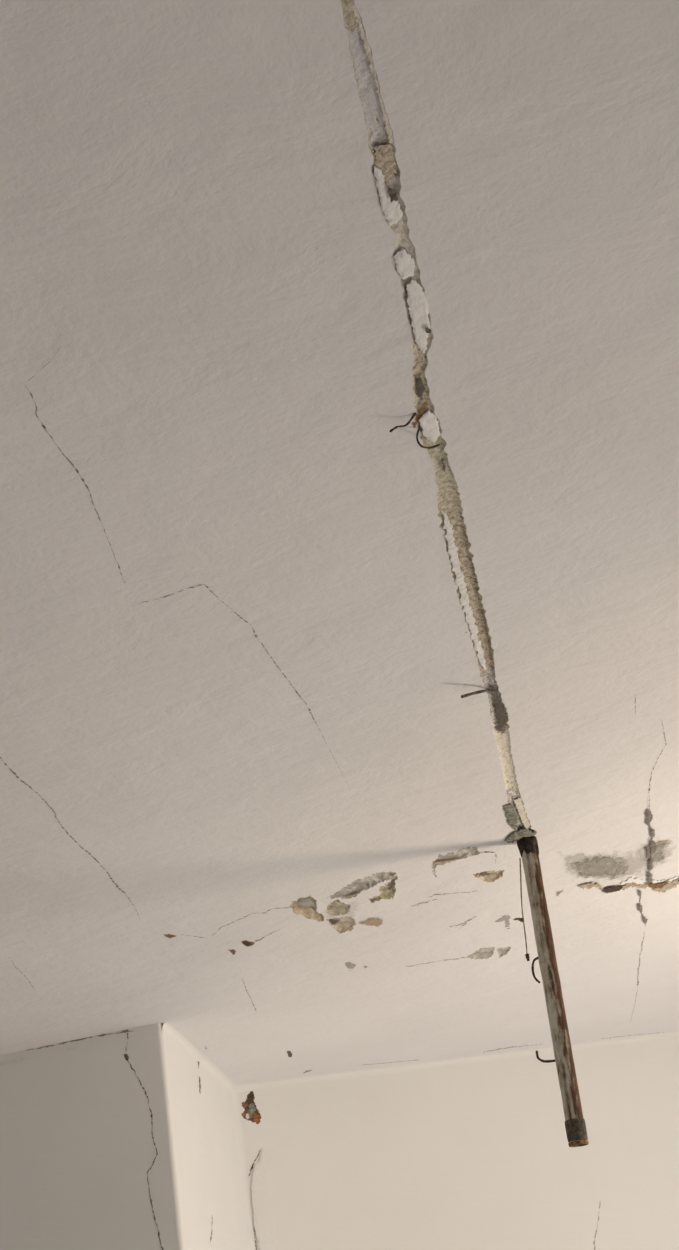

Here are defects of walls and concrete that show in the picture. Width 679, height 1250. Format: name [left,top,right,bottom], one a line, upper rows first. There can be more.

flaking render [374,166,403,227]
flaking render [394,249,431,353]
flaking render [419,410,441,444]
flaking render [441,510,488,676]
crack [0,757,138,914]
spalling [289,871,398,934]
spalling [411,846,505,907]
flaking render [578,876,679,894]
crack [604,698,666,1039]
spalling [446,947,511,960]
crack [126,1029,163,1250]